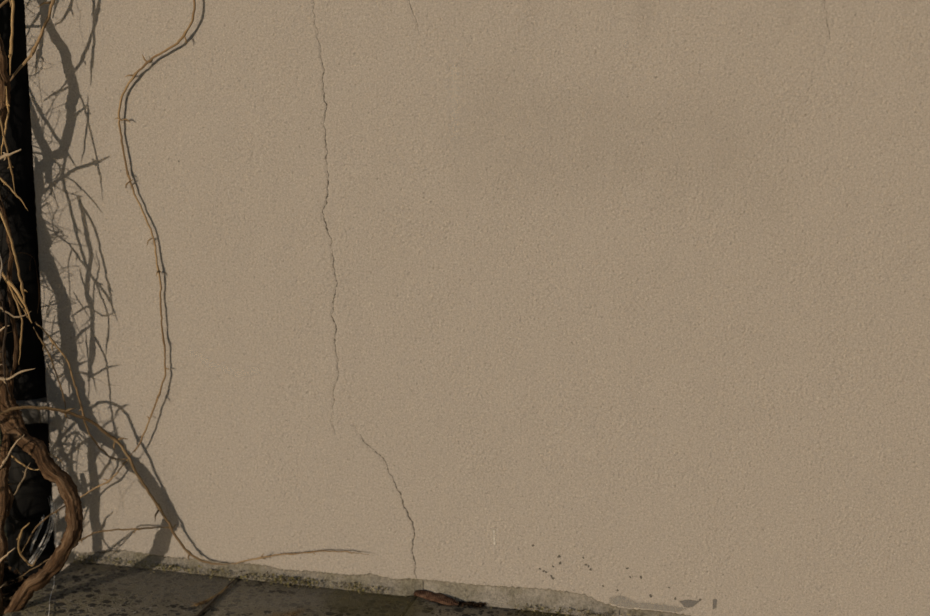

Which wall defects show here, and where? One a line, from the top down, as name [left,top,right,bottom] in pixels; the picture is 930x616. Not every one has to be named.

crack [361,436,416,572]